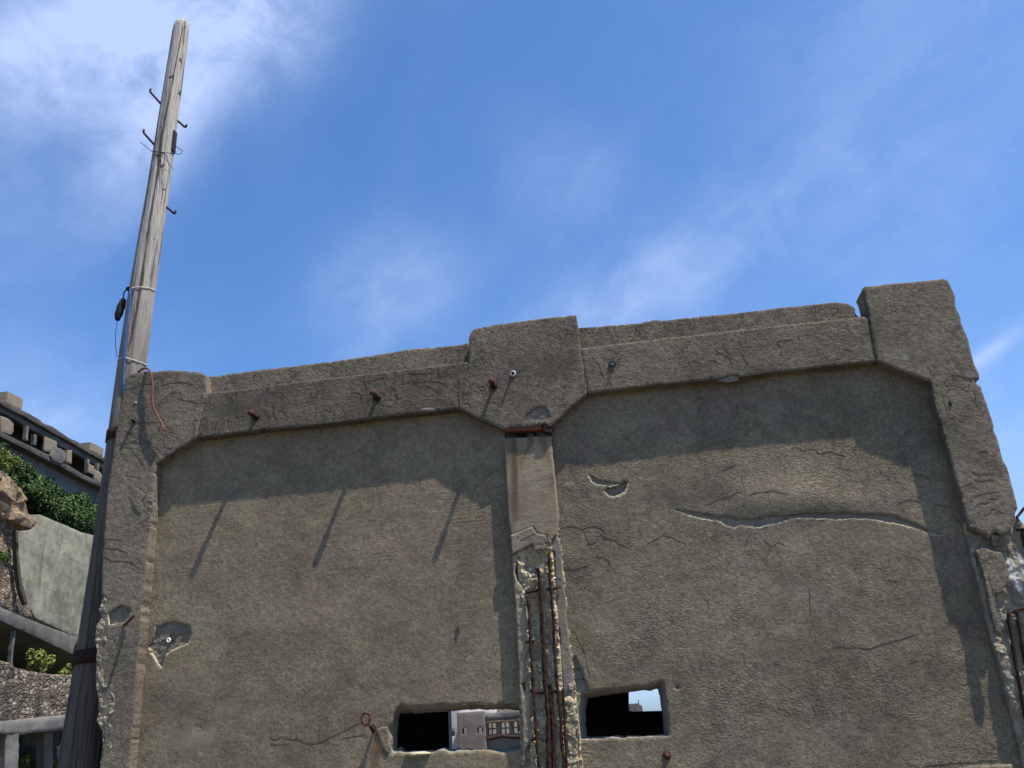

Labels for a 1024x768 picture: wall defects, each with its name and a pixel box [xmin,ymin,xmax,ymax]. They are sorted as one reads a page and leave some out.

spalling [588,475,629,498]
crack [434,446,1005,571]
flaking render [975,534,1010,637]
spalling [95,597,132,765]
spalling [148,623,191,668]
spalling [565,657,590,766]